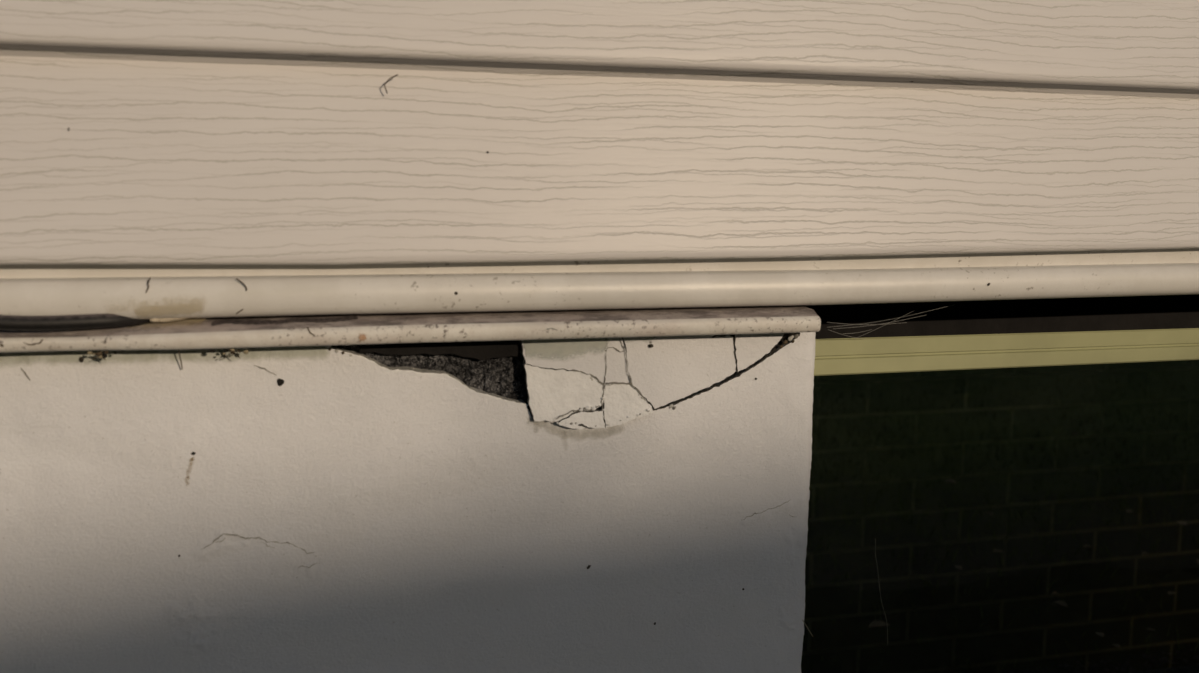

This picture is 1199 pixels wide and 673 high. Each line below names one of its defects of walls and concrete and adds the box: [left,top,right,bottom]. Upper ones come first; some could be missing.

flaking render [329,333,787,429]
crack [557,333,799,427]